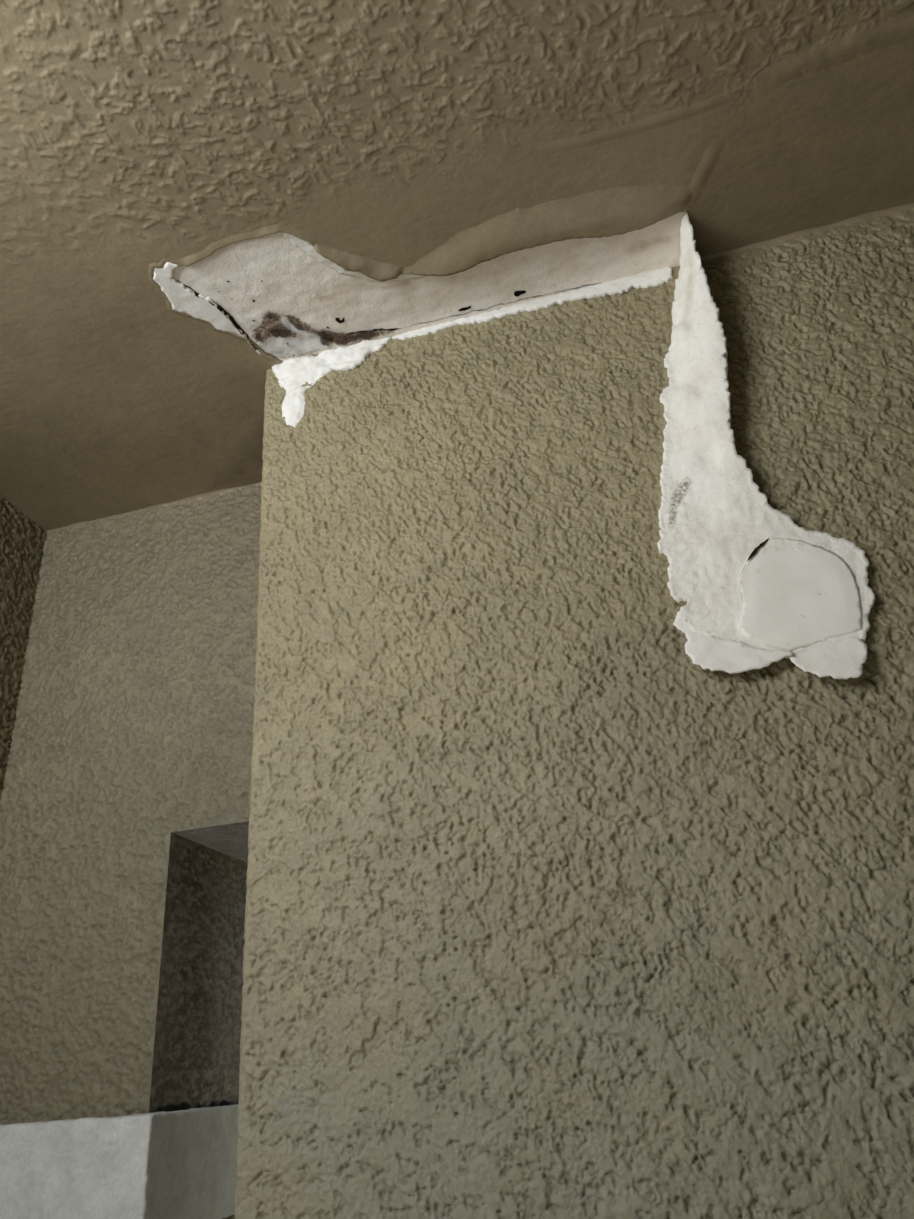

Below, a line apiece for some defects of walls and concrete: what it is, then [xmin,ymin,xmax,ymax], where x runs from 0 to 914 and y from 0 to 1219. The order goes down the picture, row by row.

peeling [149,206,875,680]